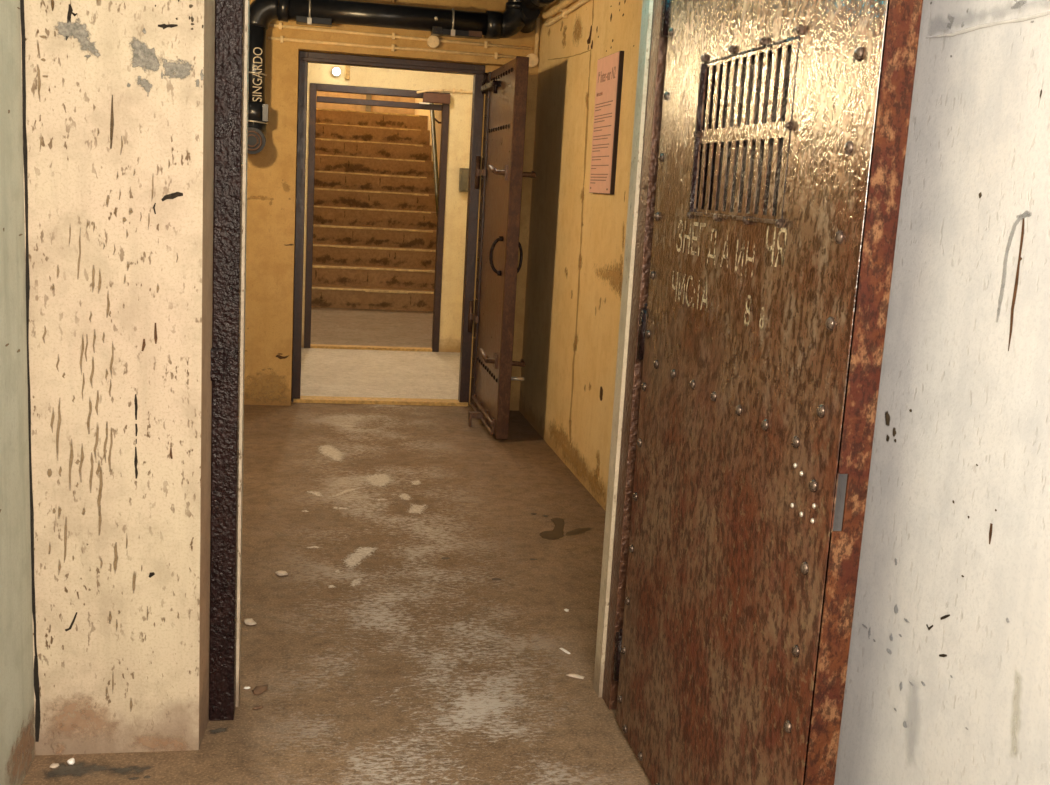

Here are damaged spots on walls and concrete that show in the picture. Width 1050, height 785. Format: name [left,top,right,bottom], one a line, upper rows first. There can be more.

spalling [37,19,100,100]
spalling [127,28,204,97]
damp [550,426,604,495]
damp [531,513,592,540]